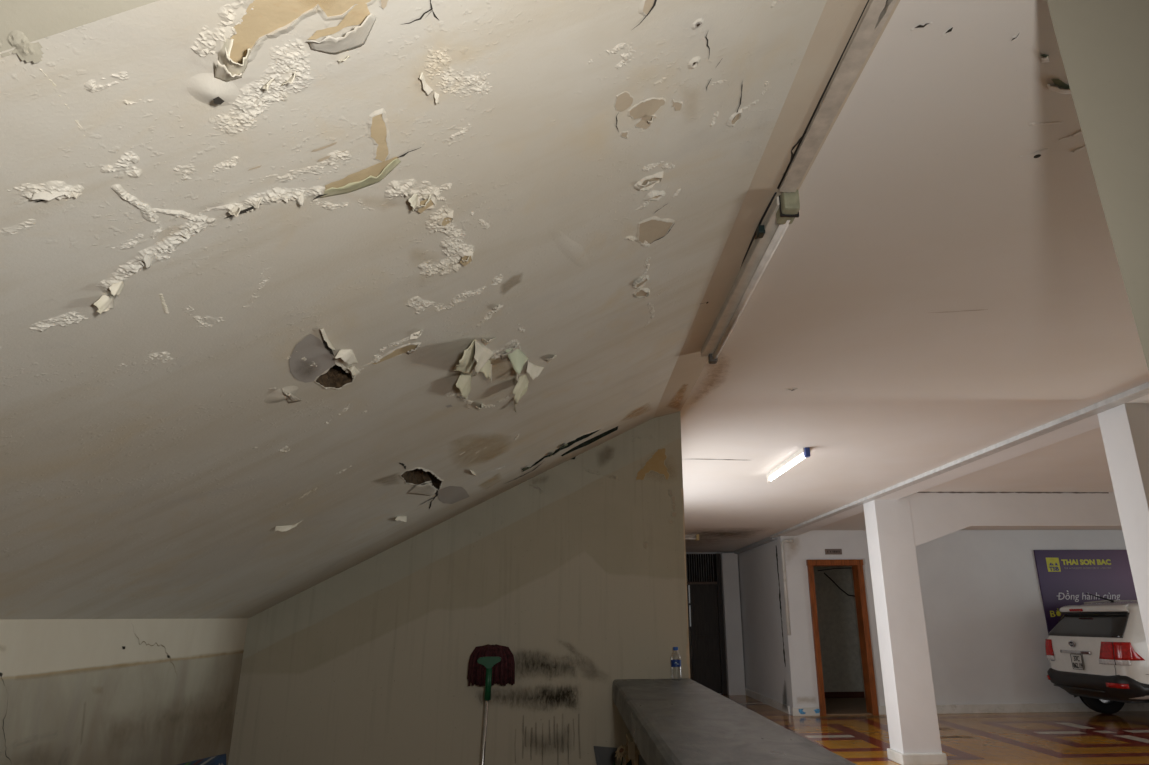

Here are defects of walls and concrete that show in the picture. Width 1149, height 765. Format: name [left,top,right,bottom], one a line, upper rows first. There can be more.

peeling [190,0,389,134]
peeling [614,77,683,139]
peeling [29,108,475,332]
peeling [624,161,681,328]
peeling [404,274,503,314]
flaking render [286,328,424,390]
peeling [444,305,557,412]
crack [509,426,618,482]
flaking render [398,463,469,509]